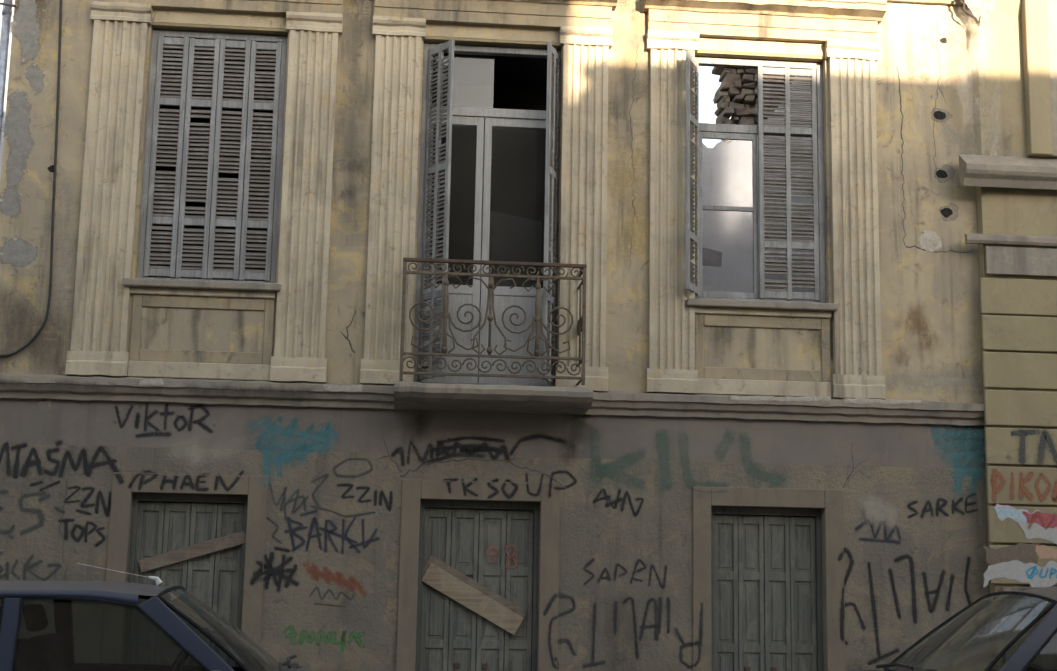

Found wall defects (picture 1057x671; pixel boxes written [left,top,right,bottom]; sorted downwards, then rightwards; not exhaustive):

crack [960,0,981,26]
spalling [964,0,995,22]
peeling [0,0,47,218]
crack [933,20,947,178]
spalling [931,108,953,123]
crack [896,67,972,253]
spalling [934,164,955,183]
spalling [939,203,959,221]
spalling [918,228,942,252]
crack [340,310,356,353]